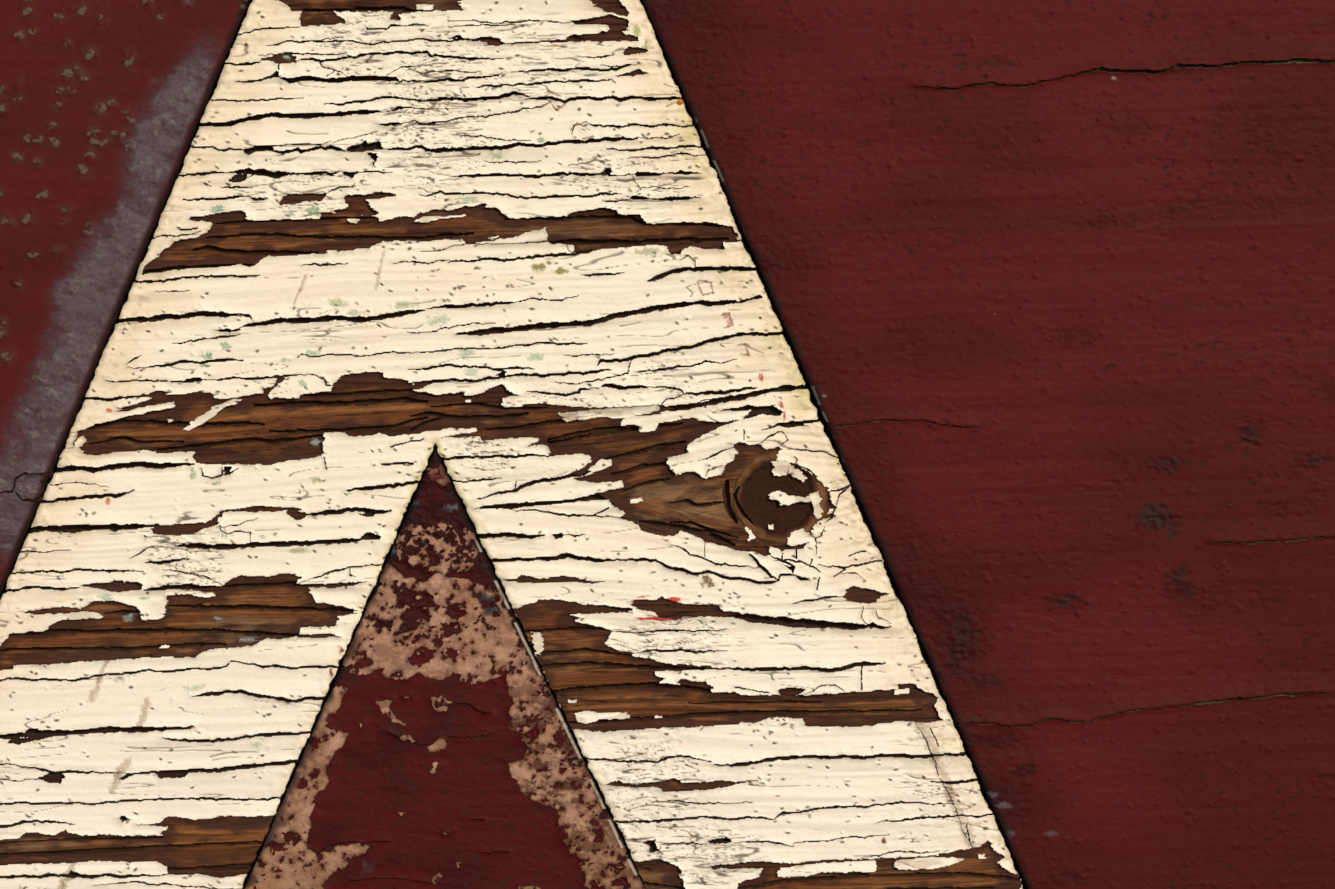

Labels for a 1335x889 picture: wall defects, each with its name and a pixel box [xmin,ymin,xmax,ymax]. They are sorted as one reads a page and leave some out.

peeling [260,52,297,64]
peeling [279,0,464,27]
peeling [471,0,649,77]
crack [915,58,1335,91]
peeling [142,191,741,275]
peeling [73,371,837,556]
crack [1212,536,1335,545]
peeling [0,521,943,889]
crack [586,692,1335,857]
peeling [711,841,1021,889]